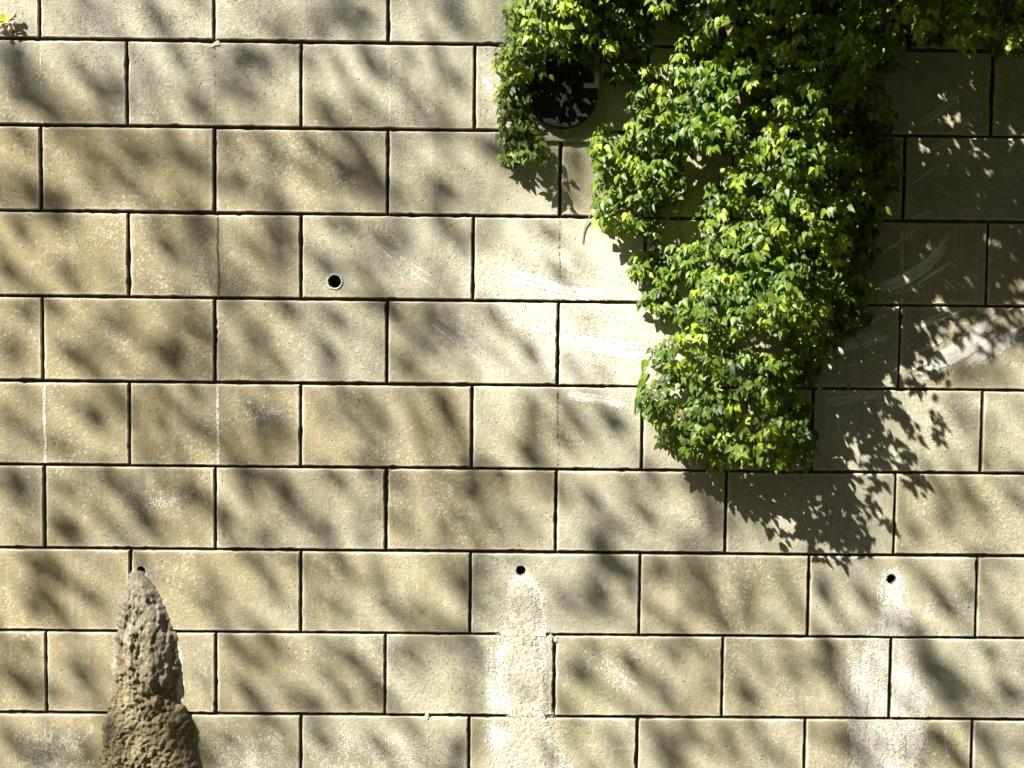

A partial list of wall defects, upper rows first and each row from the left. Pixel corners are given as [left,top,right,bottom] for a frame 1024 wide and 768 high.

crack [214,216,222,296]
water stain [474,565,579,768]
water stain [827,564,952,768]